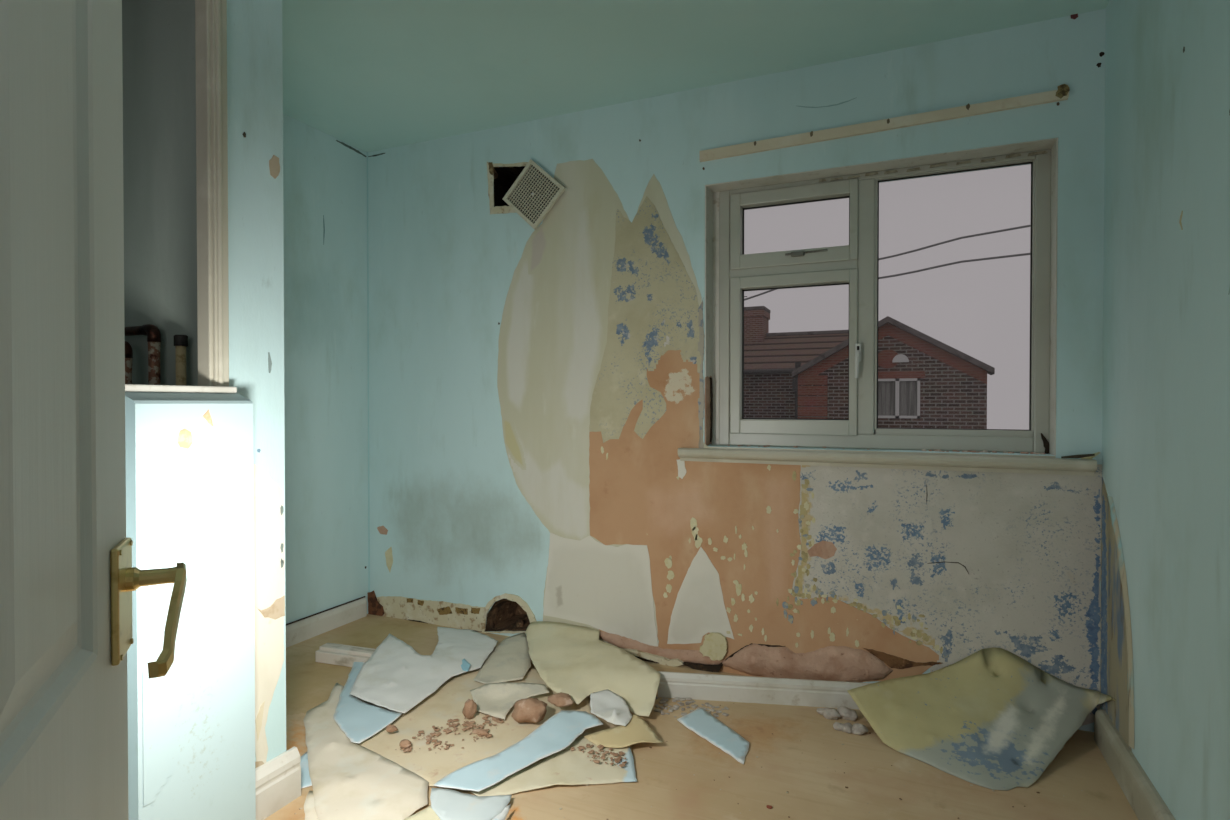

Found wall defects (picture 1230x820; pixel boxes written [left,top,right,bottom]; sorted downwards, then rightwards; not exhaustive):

peeling [269,155,280,179]
spalling [487,162,528,214]
peeling [177,429,193,449]
flaking render [589,196,1134,751]
peeling [254,449,285,768]
peeling [368,591,536,634]